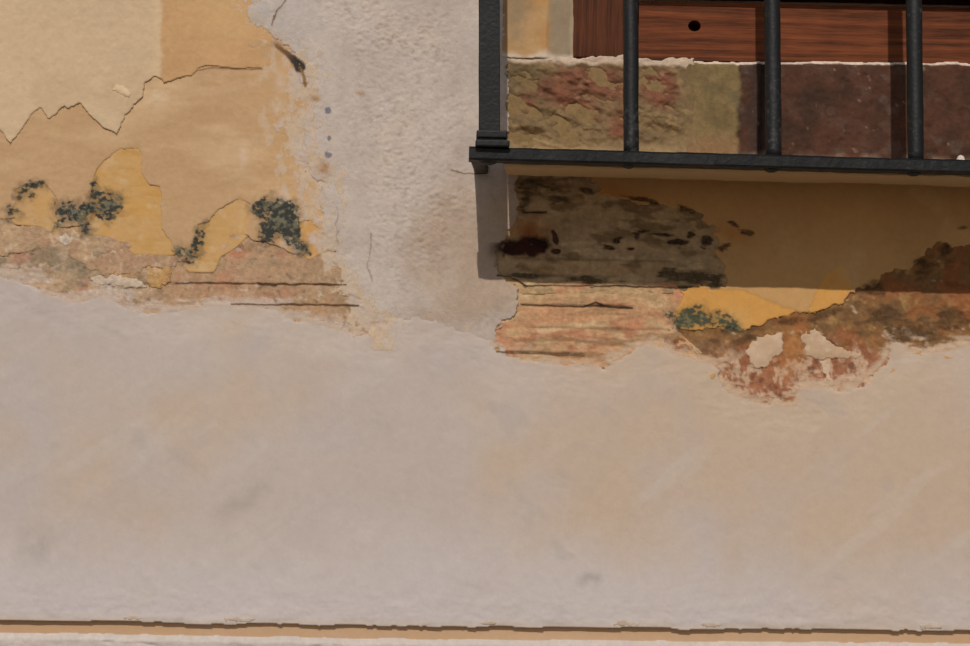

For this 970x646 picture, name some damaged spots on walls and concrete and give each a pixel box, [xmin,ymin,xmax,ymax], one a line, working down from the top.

water stain [7,180,45,215]
water stain [54,181,123,233]
water stain [175,222,205,263]
peeling [0,40,387,336]
water stain [251,197,311,255]
flaking render [494,175,970,406]
water stain [665,305,752,342]